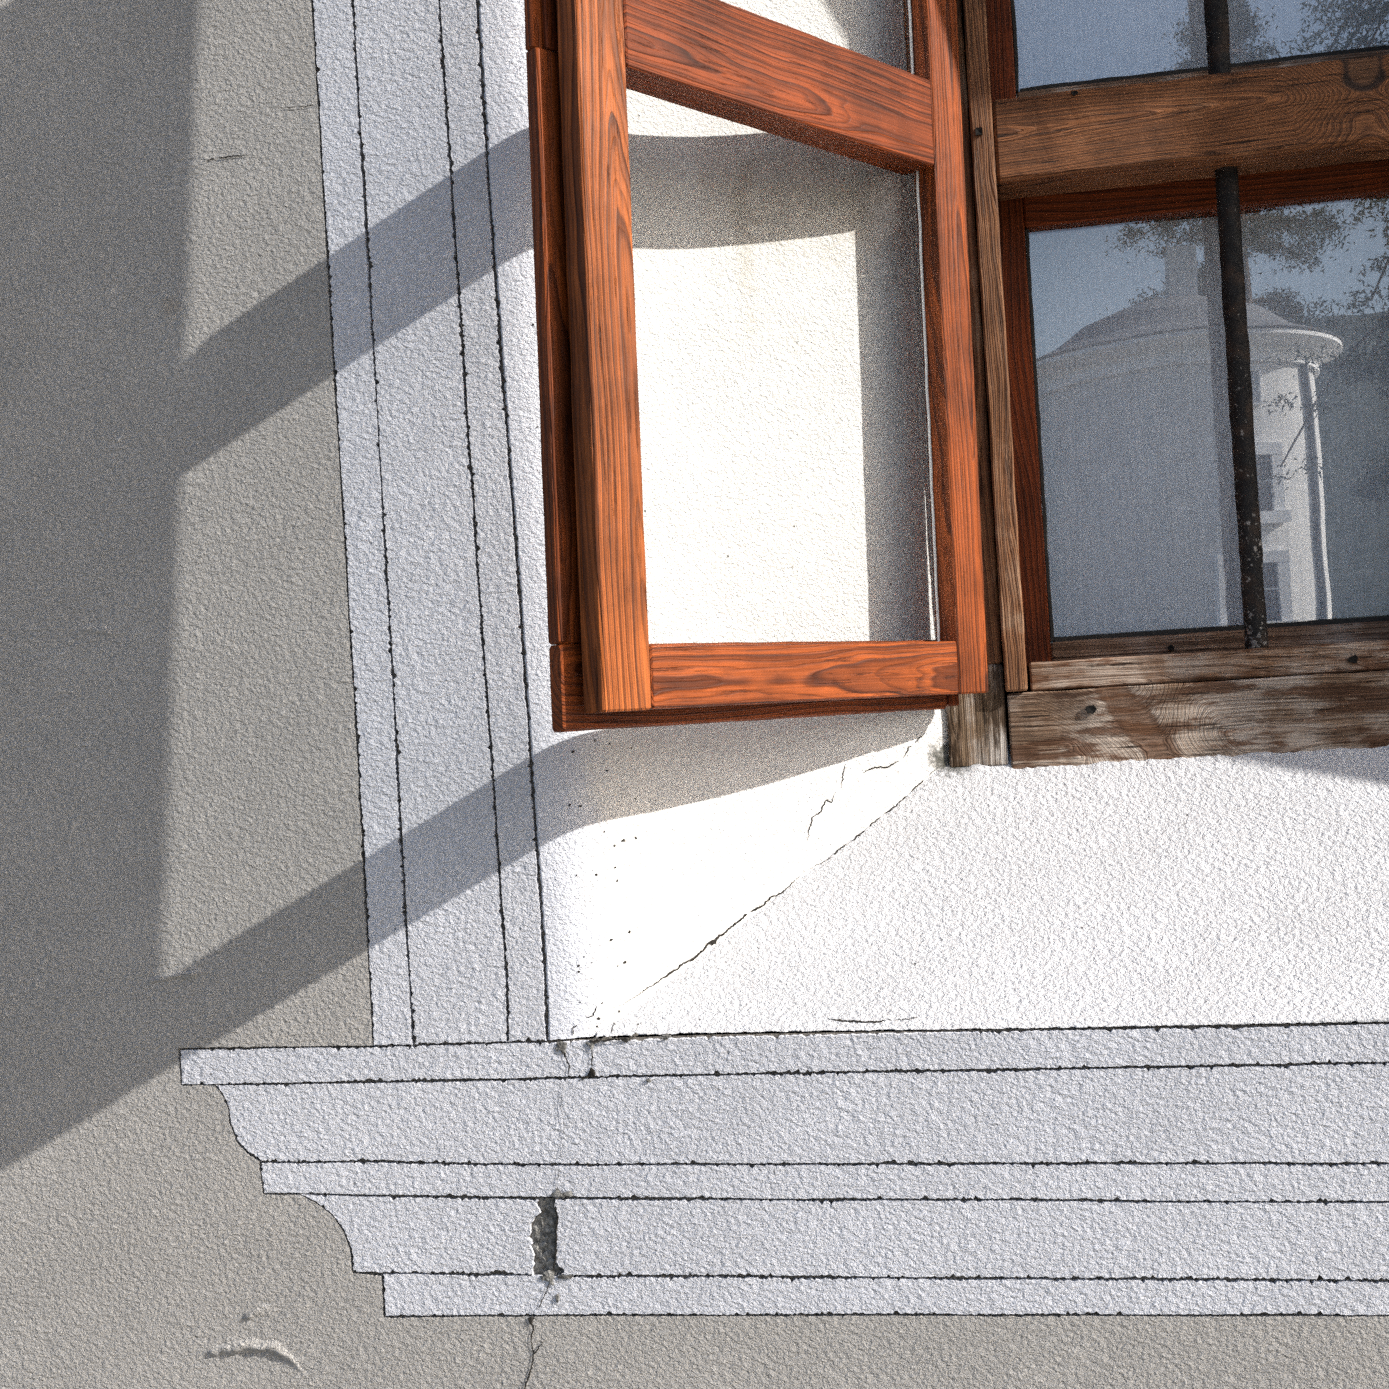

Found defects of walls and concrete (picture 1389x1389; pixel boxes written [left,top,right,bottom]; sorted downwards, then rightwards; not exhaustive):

crack [555,733,936,1180]
flaking render [532,1188,574,1282]
crack [524,1279,560,1389]